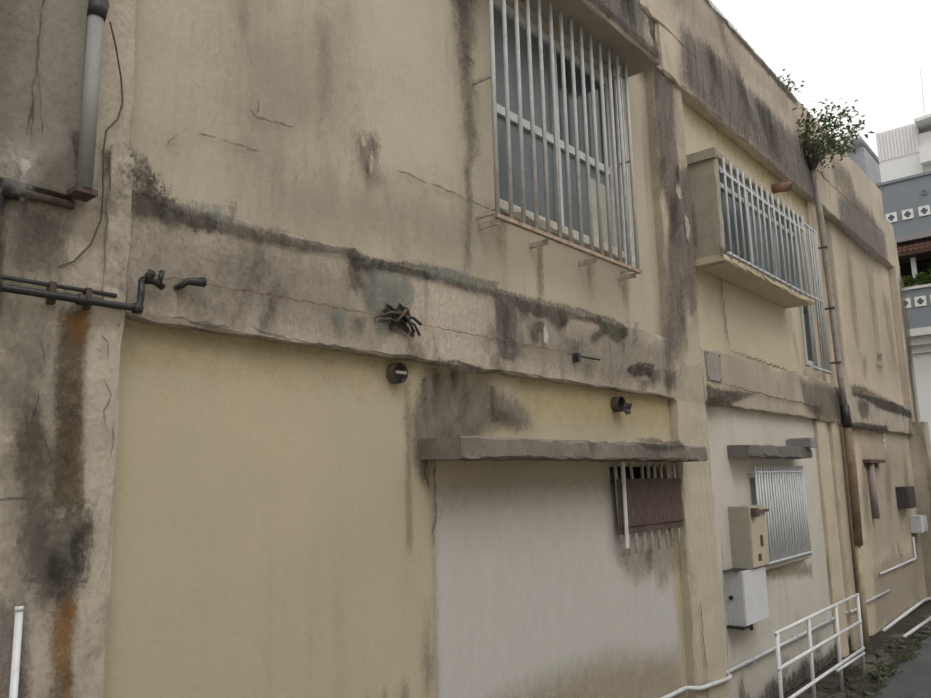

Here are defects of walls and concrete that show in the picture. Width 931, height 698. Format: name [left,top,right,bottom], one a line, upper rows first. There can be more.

crack [27,0,45,146]
crack [167,133,261,152]
crack [250,102,294,127]
crack [396,169,489,209]
water stain [589,0,815,359]
water stain [129,154,600,358]
water stain [17,306,94,610]
water stain [413,360,532,479]
water stain [627,361,676,389]
rust [52,600,76,698]
water stain [740,640,838,698]